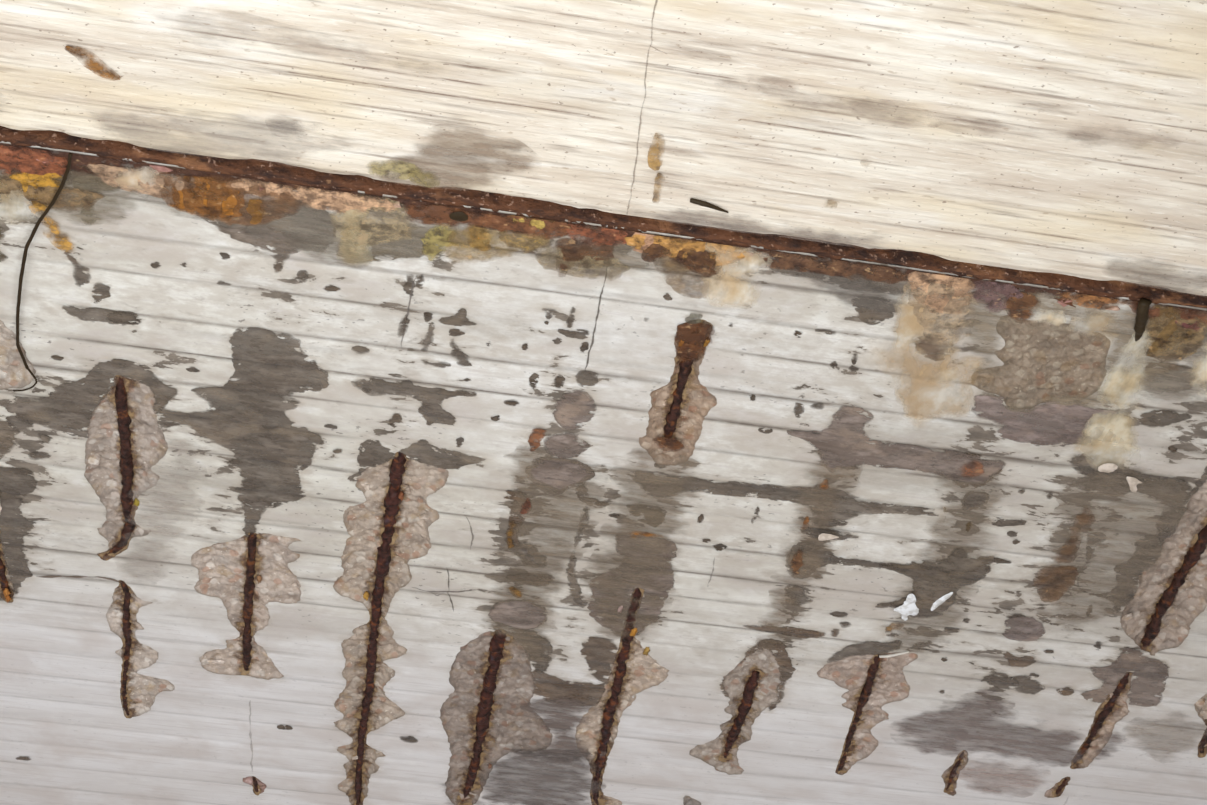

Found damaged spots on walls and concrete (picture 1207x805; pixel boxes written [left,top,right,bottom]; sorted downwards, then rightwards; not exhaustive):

crack [585,268,607,369]
corrosion [0,133,1207,363]
water stain [812,274,1009,419]
water stain [1030,294,1207,451]
spalling [106,580,175,719]
peeling [0,320,341,680]
spalling [333,309,485,805]
water stain [482,699,606,805]
water stain [489,449,694,660]
spalling [440,319,1011,805]
water stain [899,691,1081,793]
spalling [971,315,1207,798]